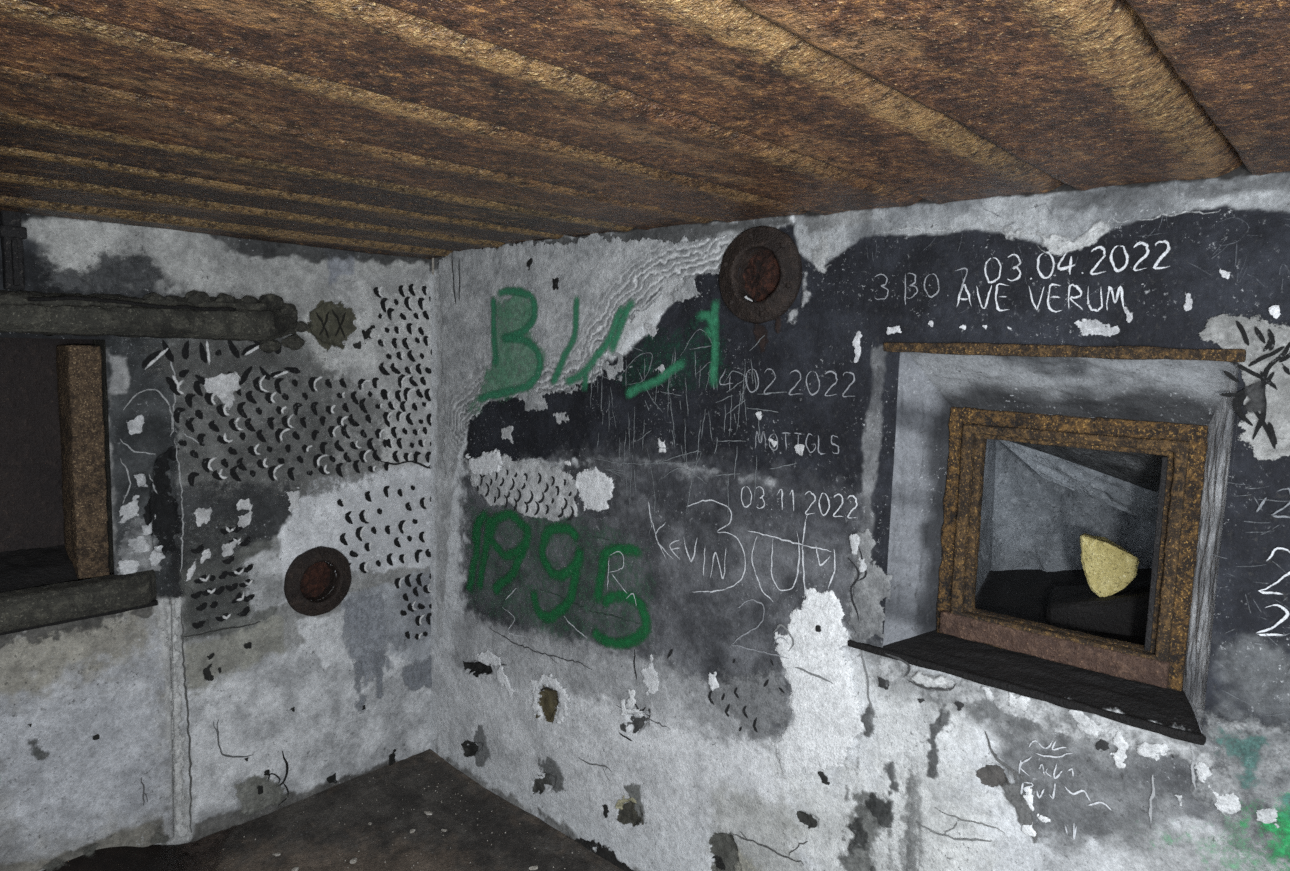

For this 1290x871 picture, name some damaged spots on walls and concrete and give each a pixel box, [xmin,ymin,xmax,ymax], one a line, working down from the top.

spalling [463,650,515,697]
spalling [531,674,571,725]
spalling [708,528,1290,863]
spalling [602,784,644,827]
damp [43,826,236,871]
spalling [709,832,762,871]